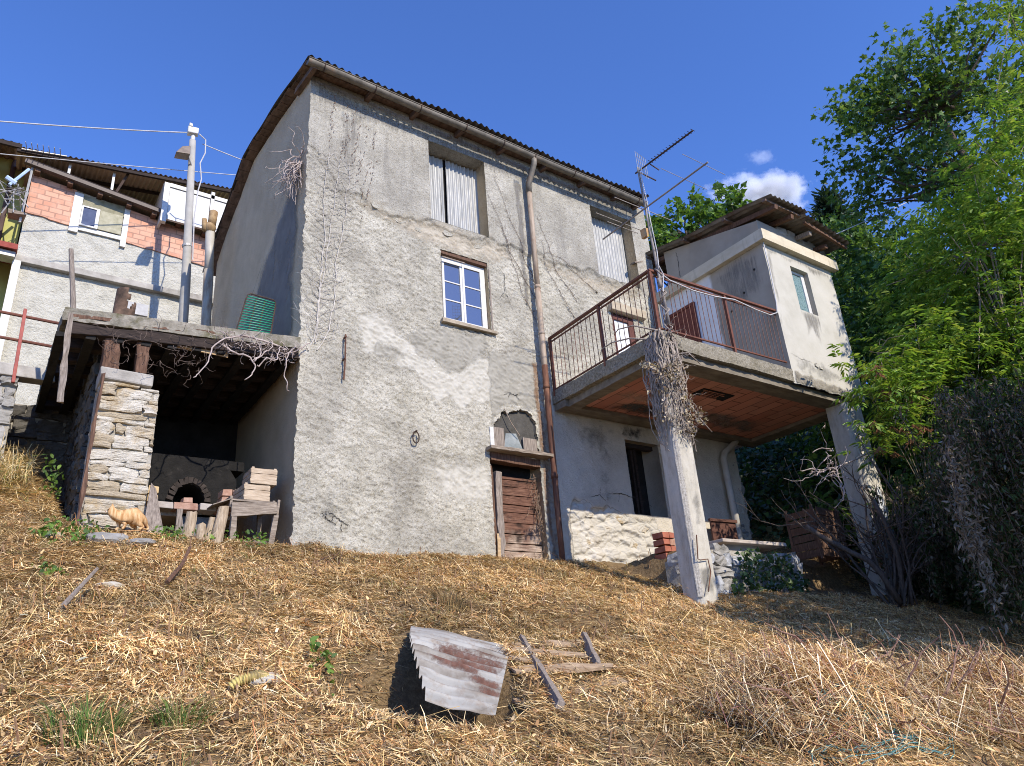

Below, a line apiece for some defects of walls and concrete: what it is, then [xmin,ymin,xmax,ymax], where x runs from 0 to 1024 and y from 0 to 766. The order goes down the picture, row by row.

spalling [357,200,510,262]